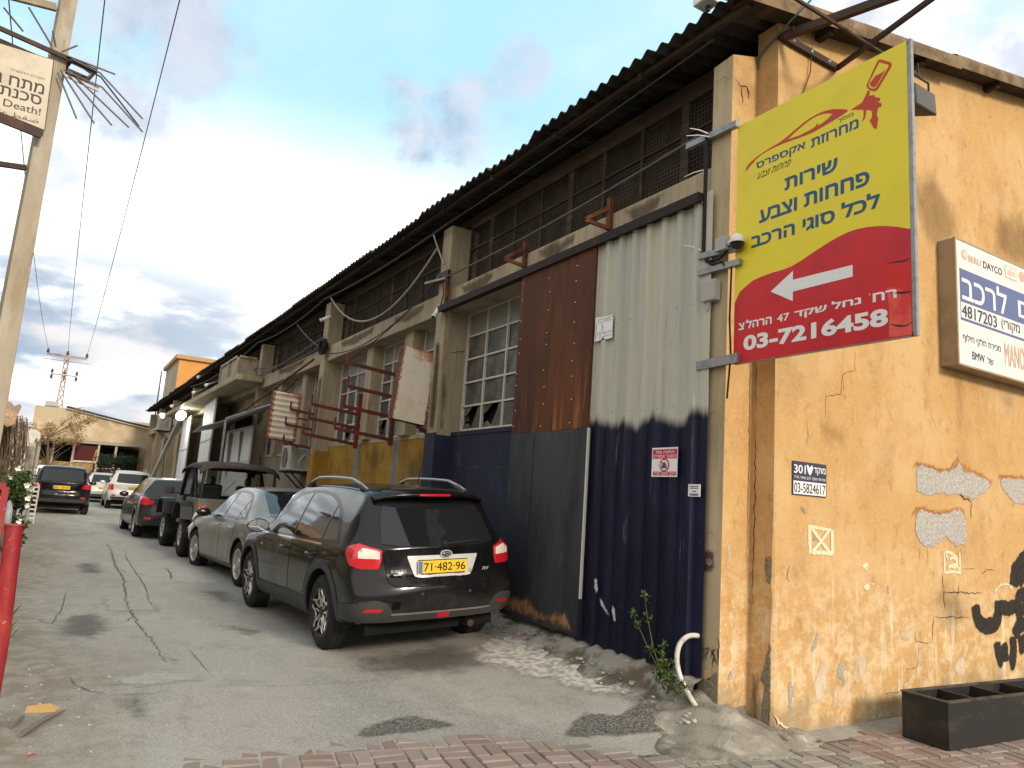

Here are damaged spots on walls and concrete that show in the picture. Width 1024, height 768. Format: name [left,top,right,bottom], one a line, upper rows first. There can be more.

rust [512,245,599,434]
peeling [912,459,1024,548]
crack [107,543,165,661]
rust [504,598,570,629]